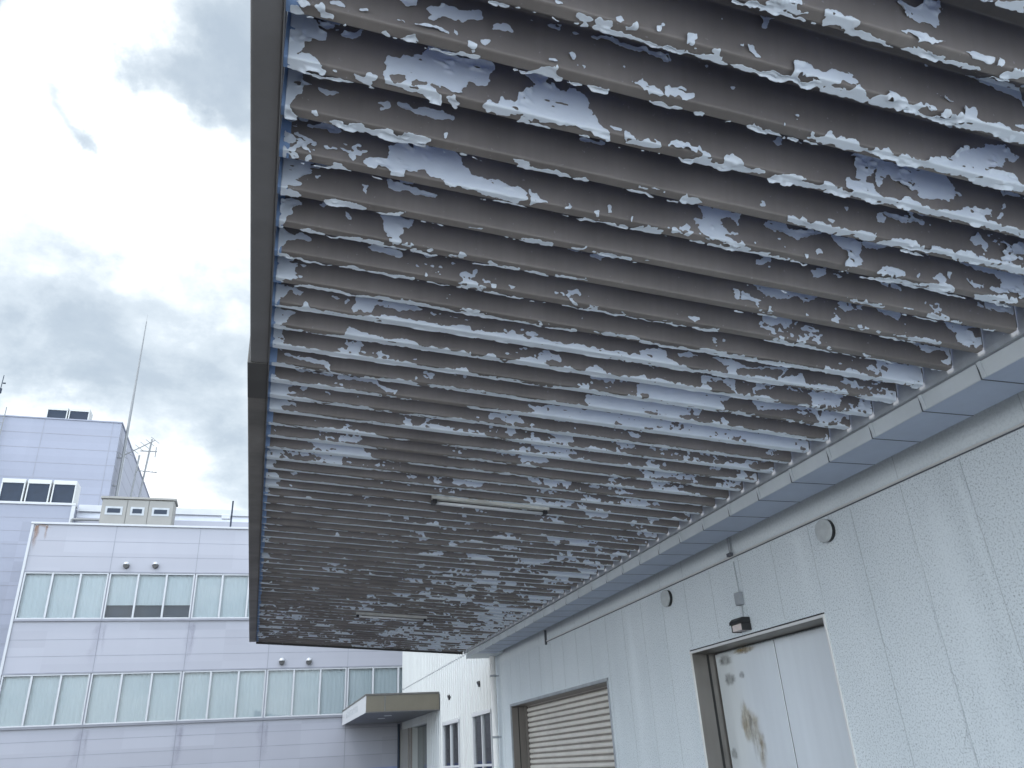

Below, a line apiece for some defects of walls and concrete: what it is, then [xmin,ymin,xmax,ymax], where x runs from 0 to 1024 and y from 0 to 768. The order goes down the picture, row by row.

peeling [257,0,1024,651]